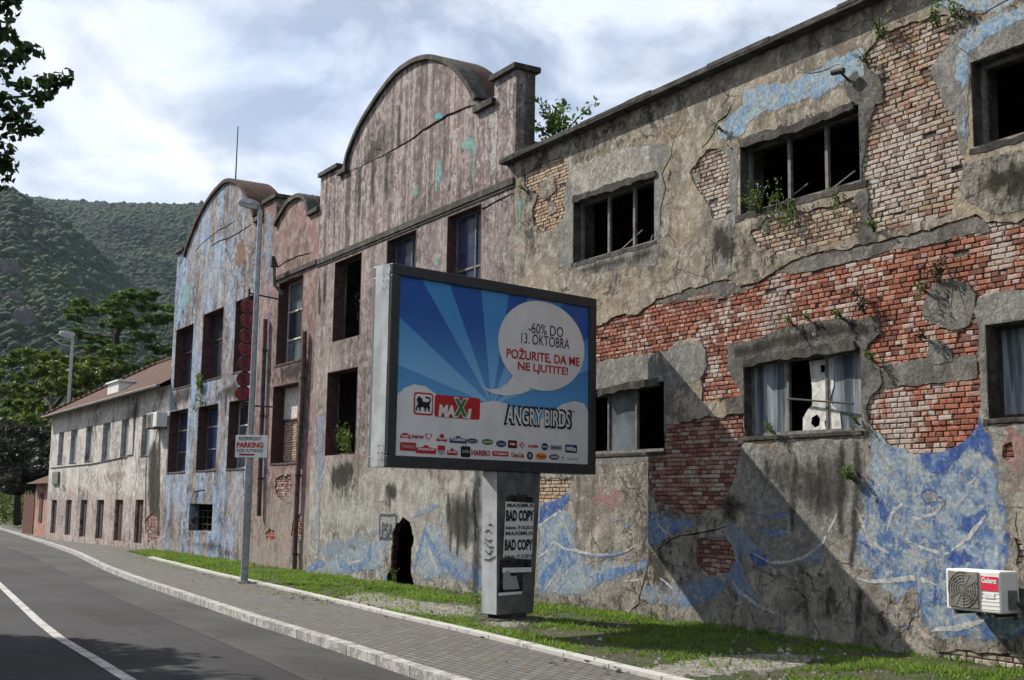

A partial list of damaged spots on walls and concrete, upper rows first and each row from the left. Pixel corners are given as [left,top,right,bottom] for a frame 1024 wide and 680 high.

crack [354,105,475,170]
spalling [519,157,569,239]
spalling [596,0,1024,454]
water stain [332,463,352,493]
spalling [649,413,745,516]
spalling [387,479,436,582]
water stain [447,491,476,555]
spalling [697,532,736,576]